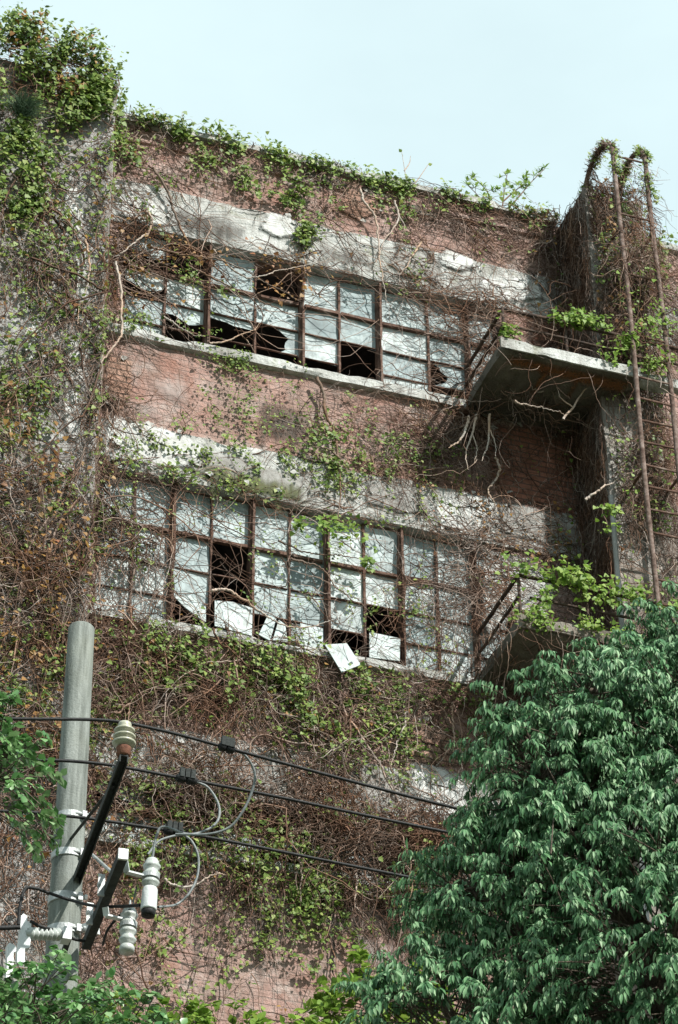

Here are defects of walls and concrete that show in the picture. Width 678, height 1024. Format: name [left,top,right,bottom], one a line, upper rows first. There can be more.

flaking render [115,186,173,226]
flaking render [261,212,297,238]
flaking render [304,168,385,222]